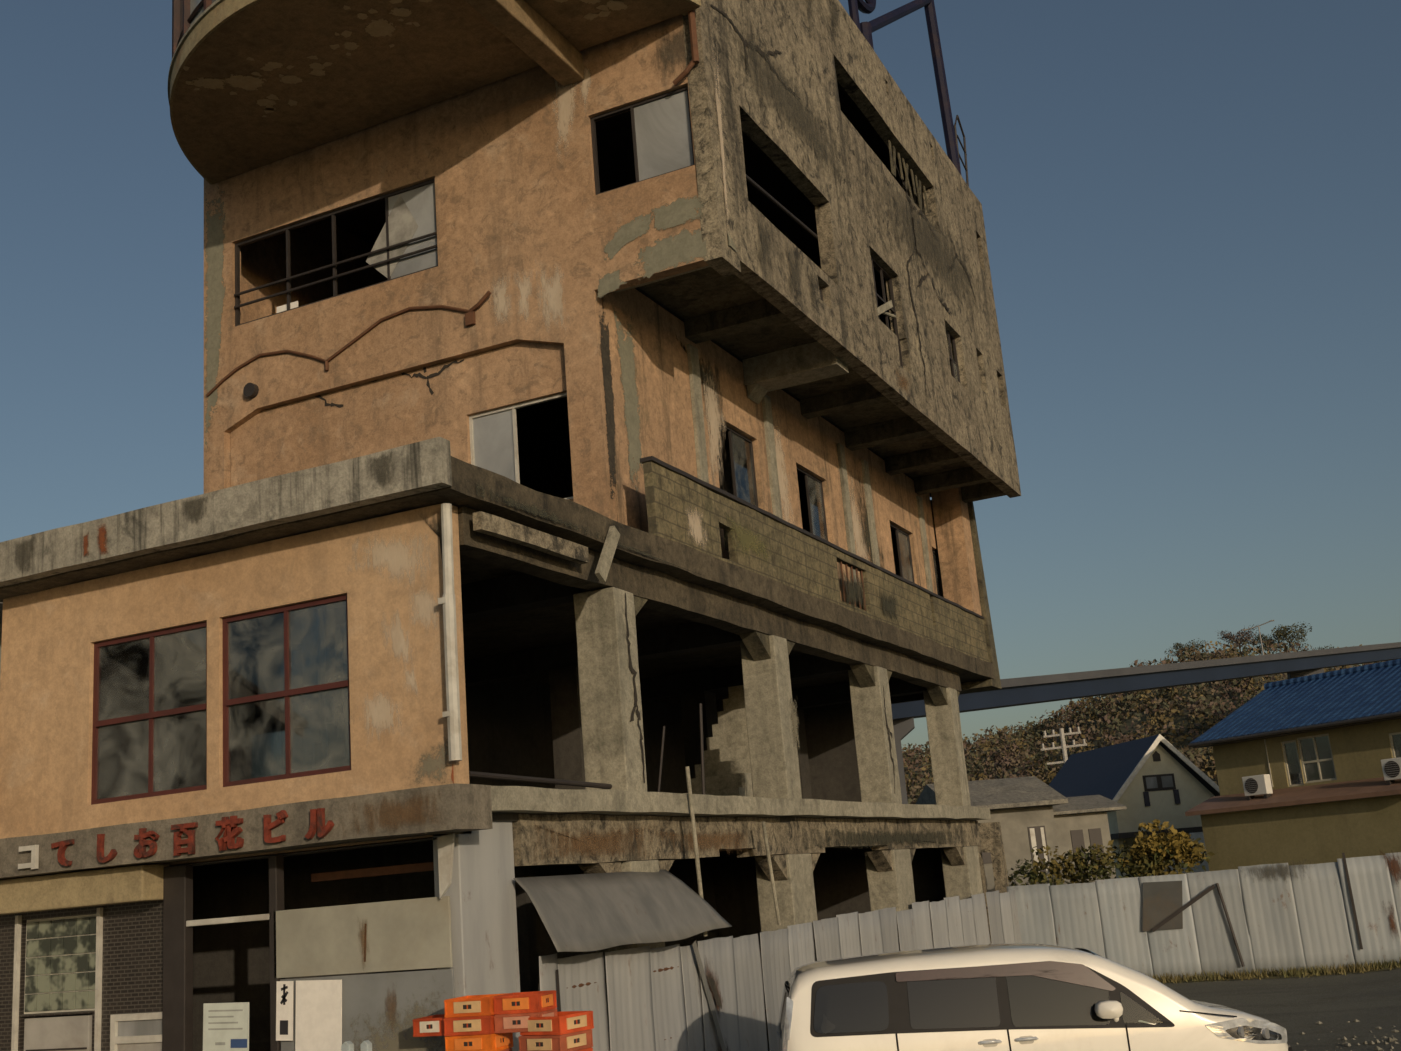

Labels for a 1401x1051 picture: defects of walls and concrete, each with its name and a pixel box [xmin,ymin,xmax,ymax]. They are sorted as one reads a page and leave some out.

peeling [183,0,432,117]
peeling [716,78,728,216]
crack [315,359,464,408]
peeling [596,196,707,500]
water stain [681,344,724,418]
corrosion [1384,855,1401,884]